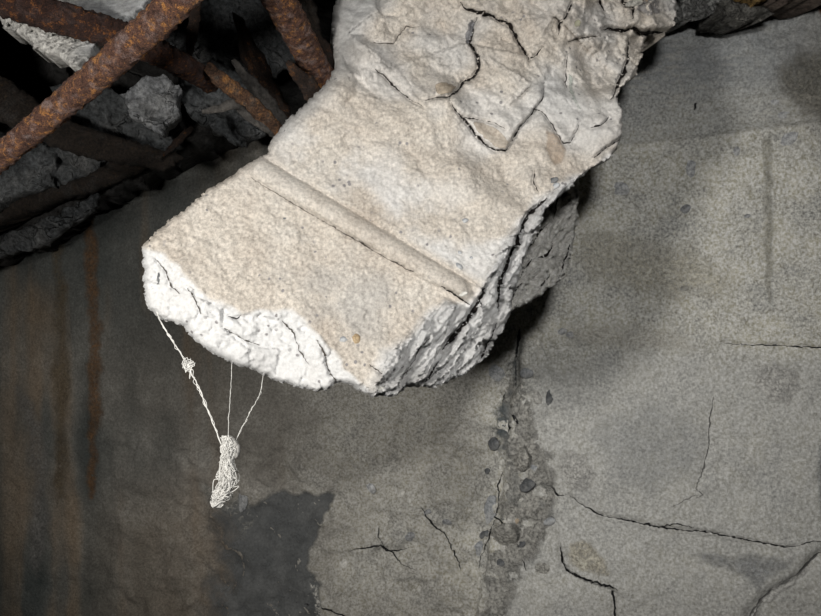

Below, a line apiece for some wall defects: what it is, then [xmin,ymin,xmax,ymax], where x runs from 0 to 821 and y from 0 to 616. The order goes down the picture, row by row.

rust [0,75,41,129]
spalling [0,0,218,175]
spalling [260,0,334,89]
rust [0,119,184,235]
crack [502,329,521,432]
crack [727,341,821,349]
leakage [208,491,334,616]
crack [353,527,417,571]
crack [422,472,503,570]
crack [551,397,821,616]